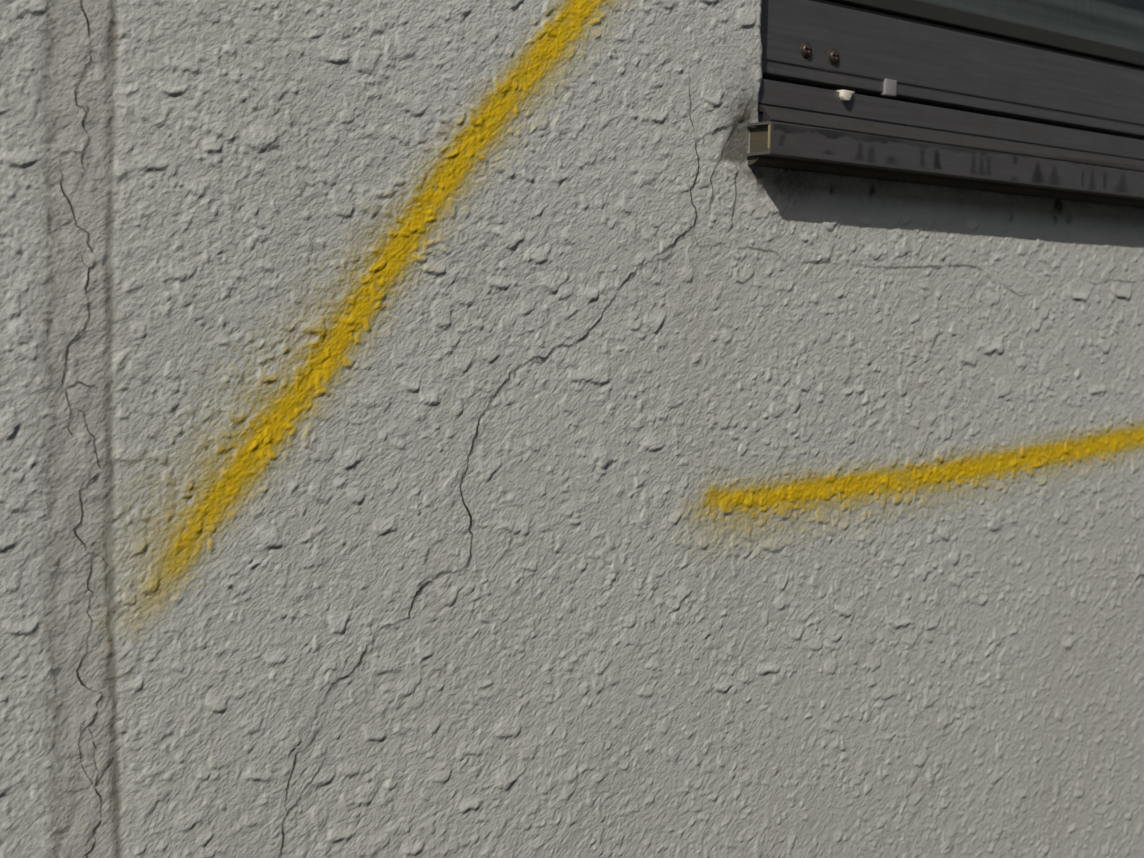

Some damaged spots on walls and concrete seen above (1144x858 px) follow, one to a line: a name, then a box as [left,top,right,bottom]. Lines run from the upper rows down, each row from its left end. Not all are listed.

crack [48,0,100,607]
crack [76,653,113,858]
crack [278,270,636,858]
crack [659,91,739,254]